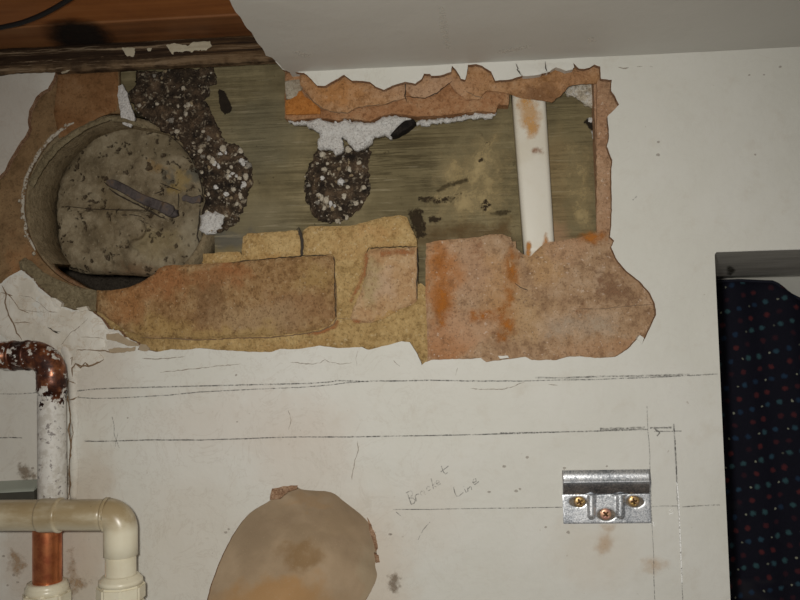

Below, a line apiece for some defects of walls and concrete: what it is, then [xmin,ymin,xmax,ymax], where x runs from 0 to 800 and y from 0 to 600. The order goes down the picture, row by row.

peeling [152,69,193,139]
peeling [0,70,150,374]
peeling [186,130,252,220]
spalling [285,62,654,362]
crack [1,286,110,498]
peeling [270,485,298,500]
peeling [367,518,380,563]